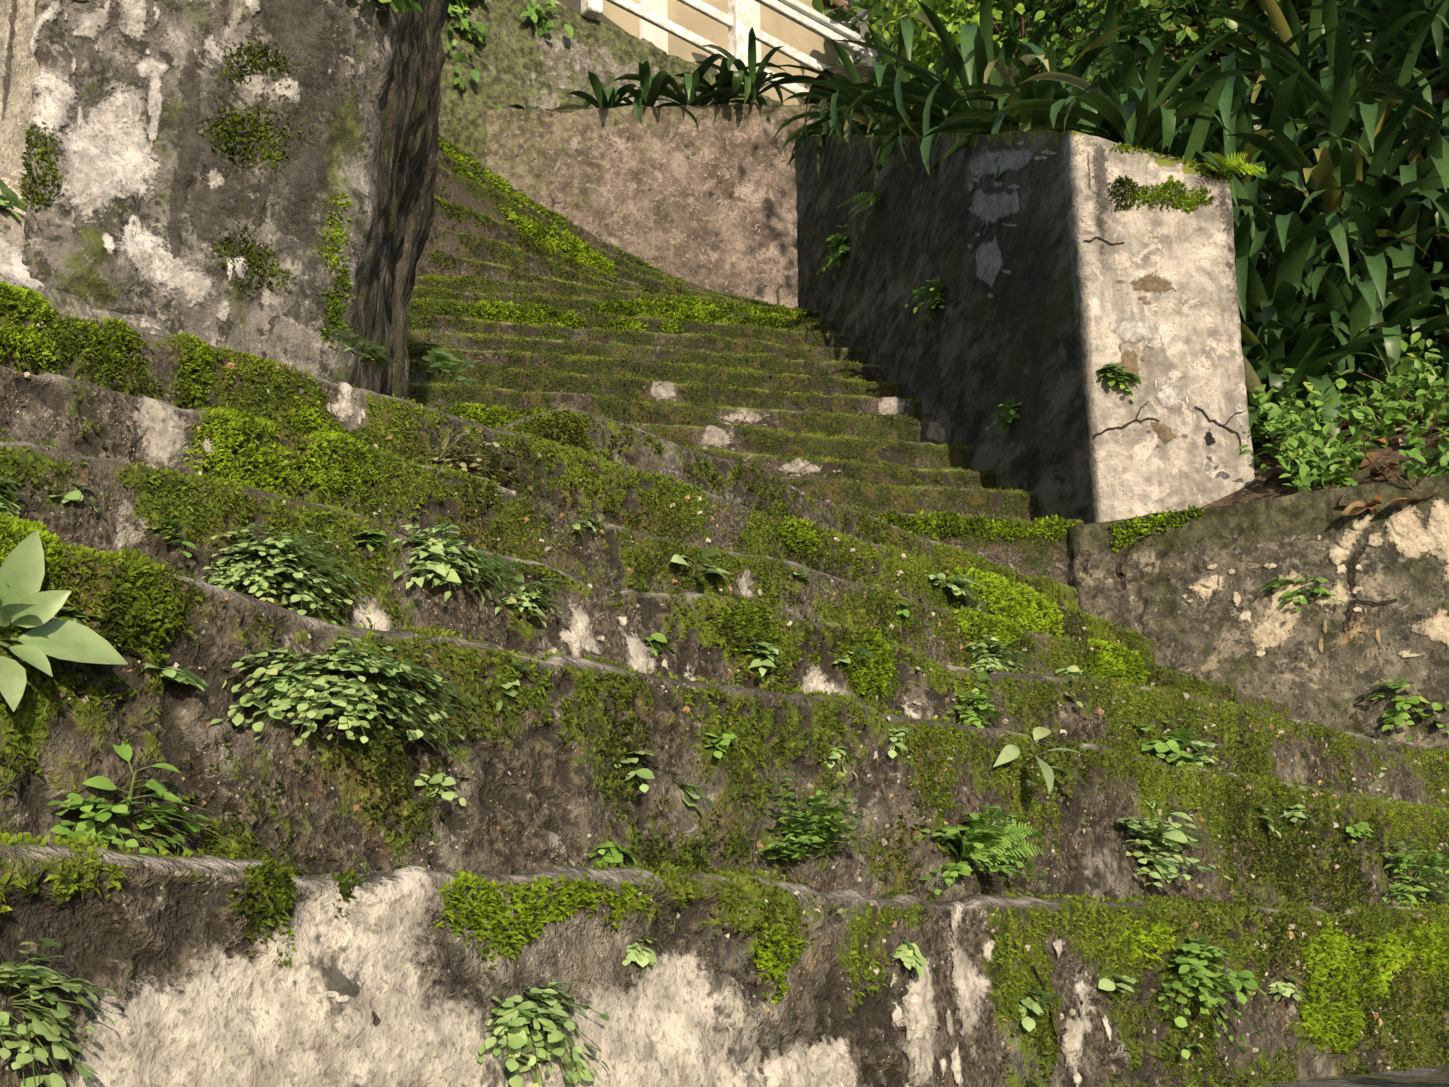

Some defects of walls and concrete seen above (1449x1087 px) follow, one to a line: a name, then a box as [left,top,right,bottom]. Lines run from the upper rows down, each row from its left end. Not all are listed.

flaking render [966,141,1056,299]
crack [1093,400,1160,438]
crack [1195,406,1244,453]